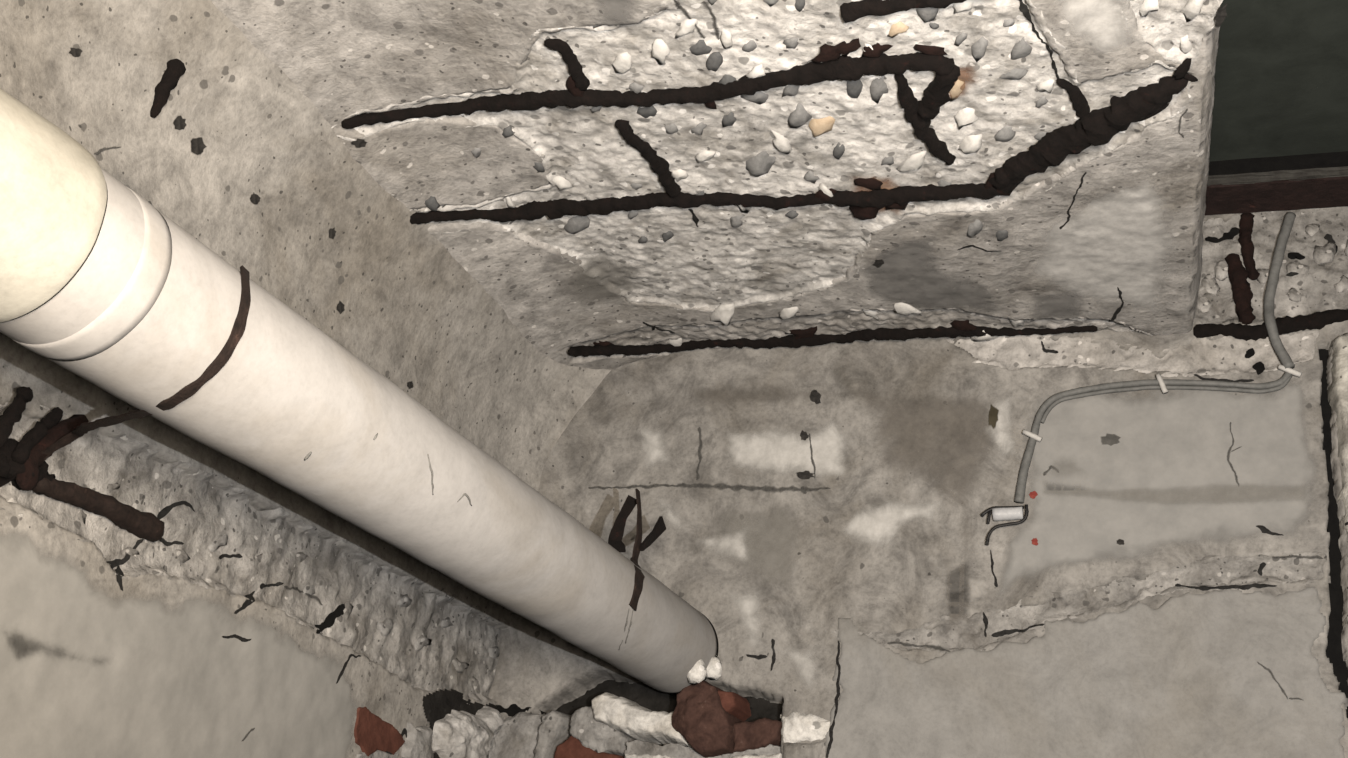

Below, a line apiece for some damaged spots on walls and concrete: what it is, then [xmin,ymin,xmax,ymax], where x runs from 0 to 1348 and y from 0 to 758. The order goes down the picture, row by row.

corrosion [950,68,971,94]
corrosion [858,180,896,192]
crack [643,322,675,334]
crack [1041,341,1058,354]
spalling [332,0,1348,758]
spalling [0,402,67,442]
crack [1175,348,1348,718]
peeling [0,427,505,758]